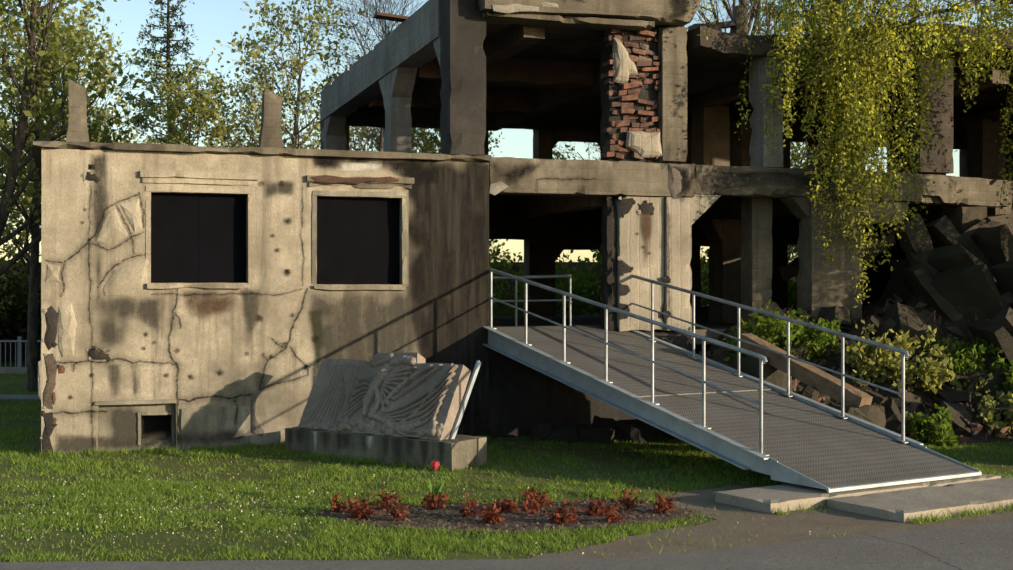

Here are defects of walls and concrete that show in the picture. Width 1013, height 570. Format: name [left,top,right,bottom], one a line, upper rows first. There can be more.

water stain [342,163,381,171]
spalling [618,197,655,218]
rust [641,212,651,253]
spalling [618,256,634,320]
water stain [102,299,158,343]
crack [46,185,309,452]
water stain [242,291,258,330]
water stain [313,295,412,362]
spalling [38,306,65,455]